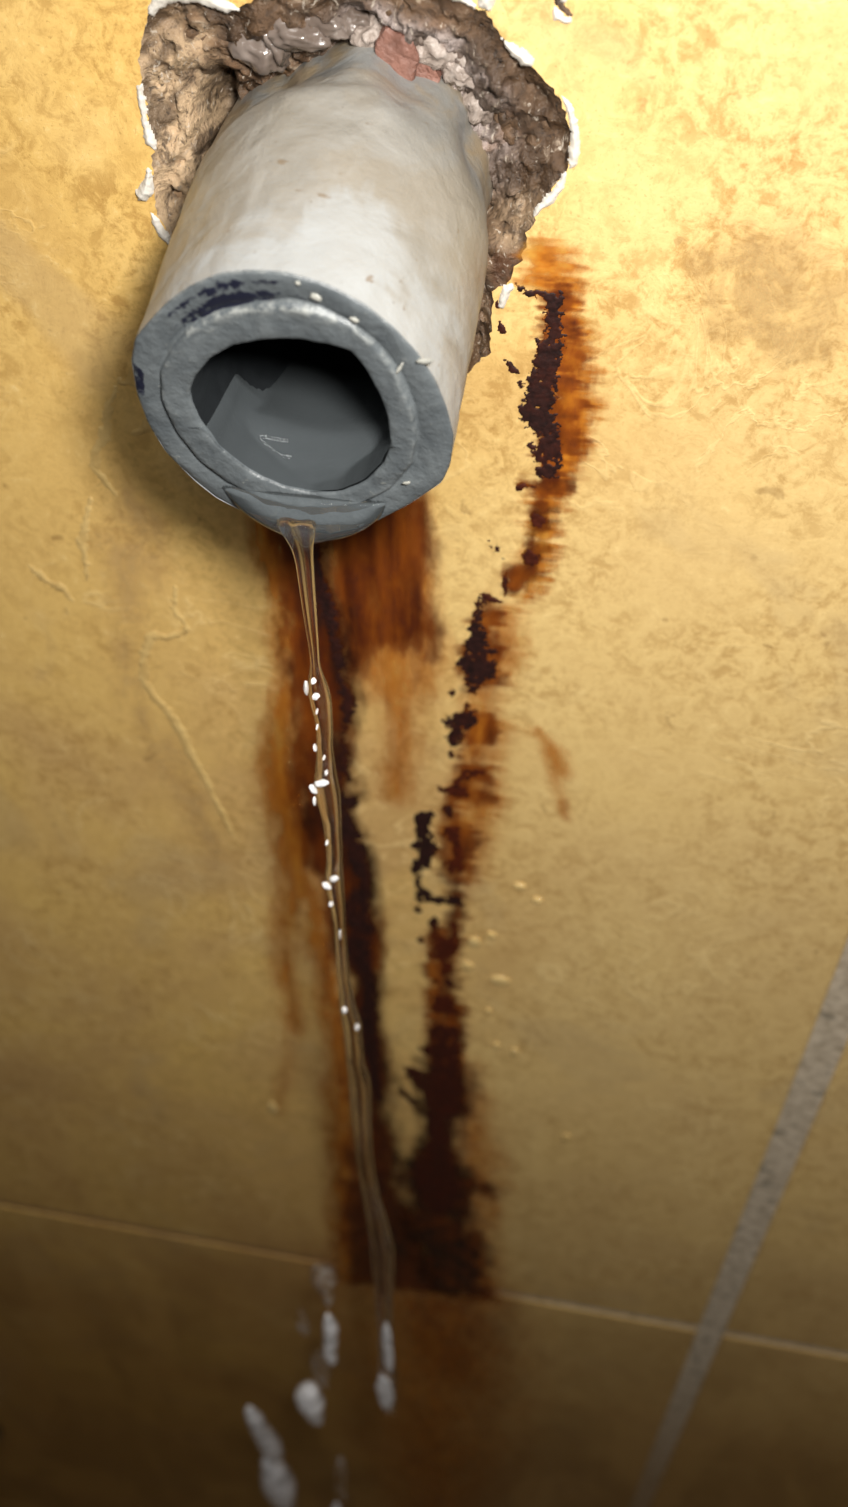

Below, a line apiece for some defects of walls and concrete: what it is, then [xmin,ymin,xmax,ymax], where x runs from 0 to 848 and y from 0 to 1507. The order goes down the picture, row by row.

spalling [135,0,580,374]
corrosion [252,238,603,1302]